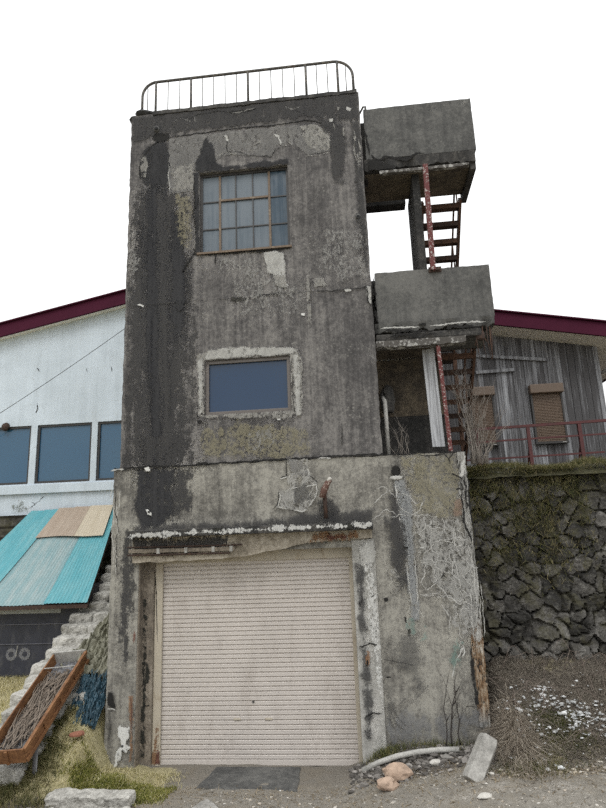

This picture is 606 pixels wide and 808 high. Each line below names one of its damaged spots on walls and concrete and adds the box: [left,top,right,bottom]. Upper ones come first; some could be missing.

water stain [131,93,368,267]
peeling [110,484,121,578]
water stain [117,172,373,757]
peeling [130,521,372,539]
spalling [273,459,318,512]
water stain [384,479,426,641]